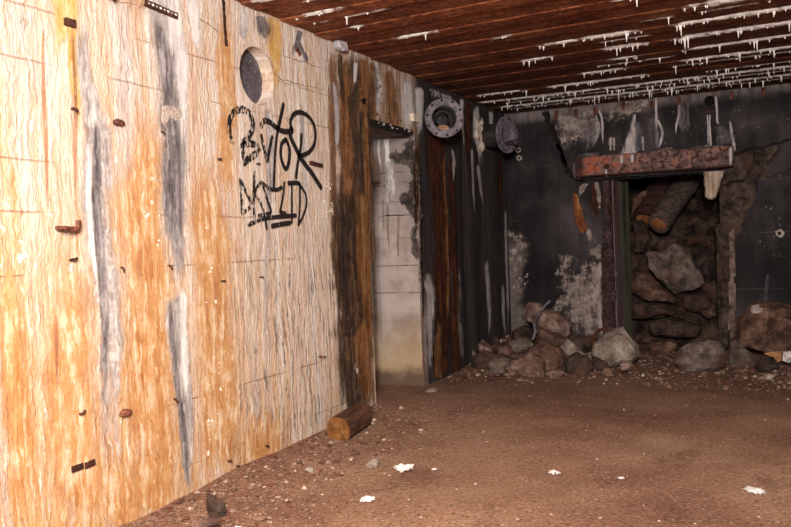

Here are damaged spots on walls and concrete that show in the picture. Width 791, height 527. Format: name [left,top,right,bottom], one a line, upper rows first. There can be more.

rust [54,0,80,173]
rust [2,123,180,525]
leakage [76,28,124,405]
leakage [150,0,201,271]
leakage [165,290,194,483]
rust [188,18,285,472]
leakage [295,0,386,31]
leakage [327,50,395,407]
leakage [398,30,438,40]
leakage [461,0,791,199]
crack [542,111,715,183]
crack [735,138,791,162]